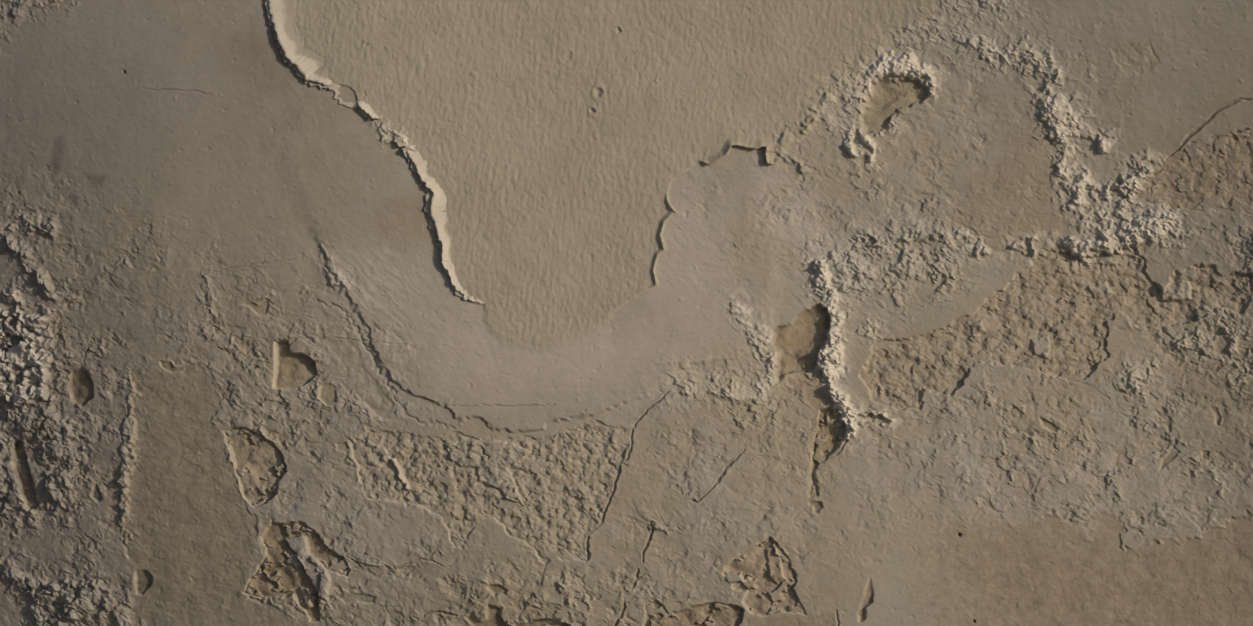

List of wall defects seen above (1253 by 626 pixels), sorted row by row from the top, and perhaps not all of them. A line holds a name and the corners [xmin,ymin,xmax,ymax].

leakage [0,214,57,406]
flaking render [0,359,353,626]
flaking render [272,340,338,408]
flaking render [348,420,638,568]
peeling [264,0,950,348]
crack [585,389,672,564]
flaking render [642,536,809,626]
flaking render [668,303,833,405]
flaking render [809,405,847,512]
leakage [731,0,1184,449]
flaking render [858,234,1253,414]
crack [1163,97,1253,162]